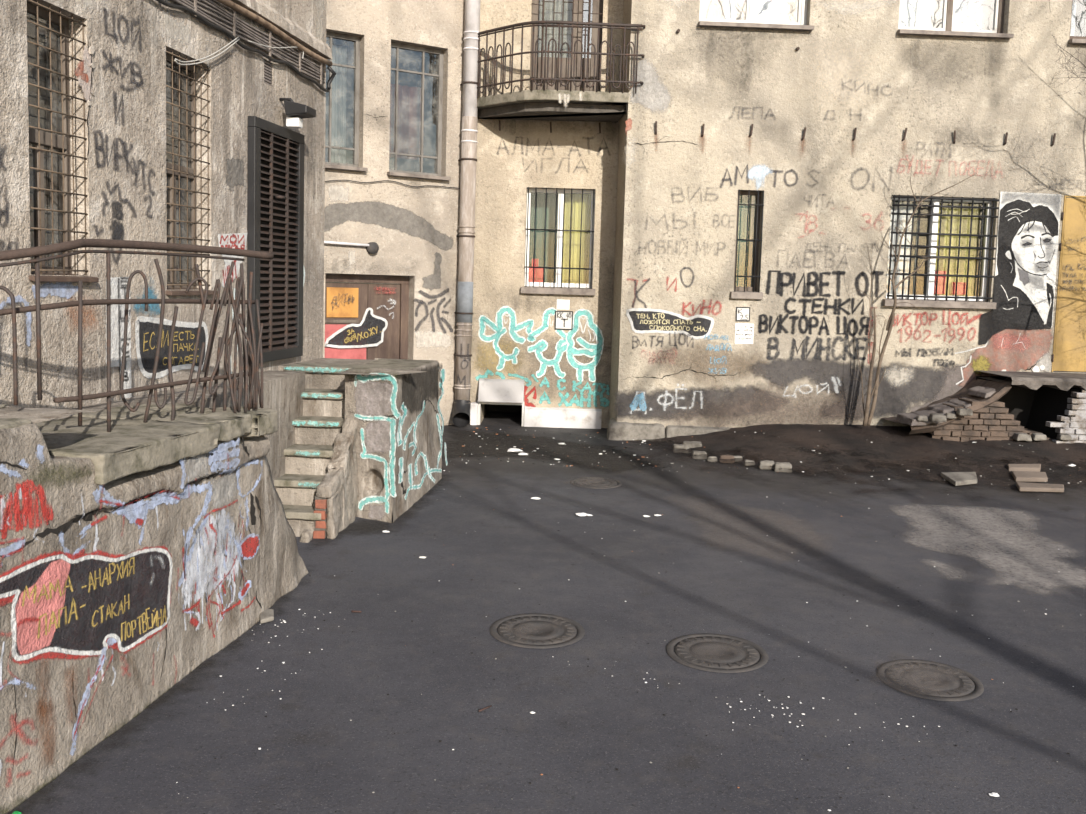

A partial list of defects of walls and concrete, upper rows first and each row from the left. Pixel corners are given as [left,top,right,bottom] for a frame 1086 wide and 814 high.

crack [621,362,746,382]
spalling [54,508,101,536]